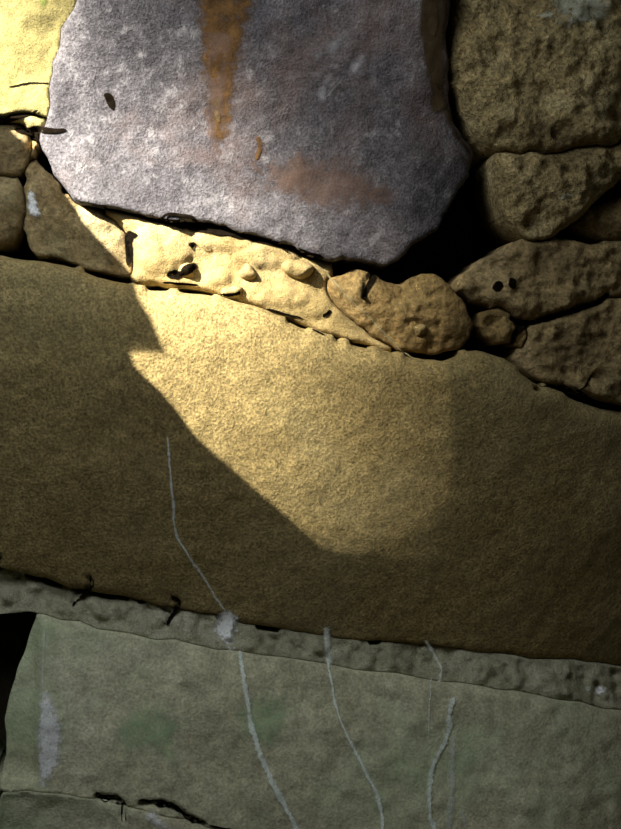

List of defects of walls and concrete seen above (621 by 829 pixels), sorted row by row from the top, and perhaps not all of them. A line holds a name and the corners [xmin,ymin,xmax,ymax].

corrosion [198,0,252,146]
crack [98,793,230,829]